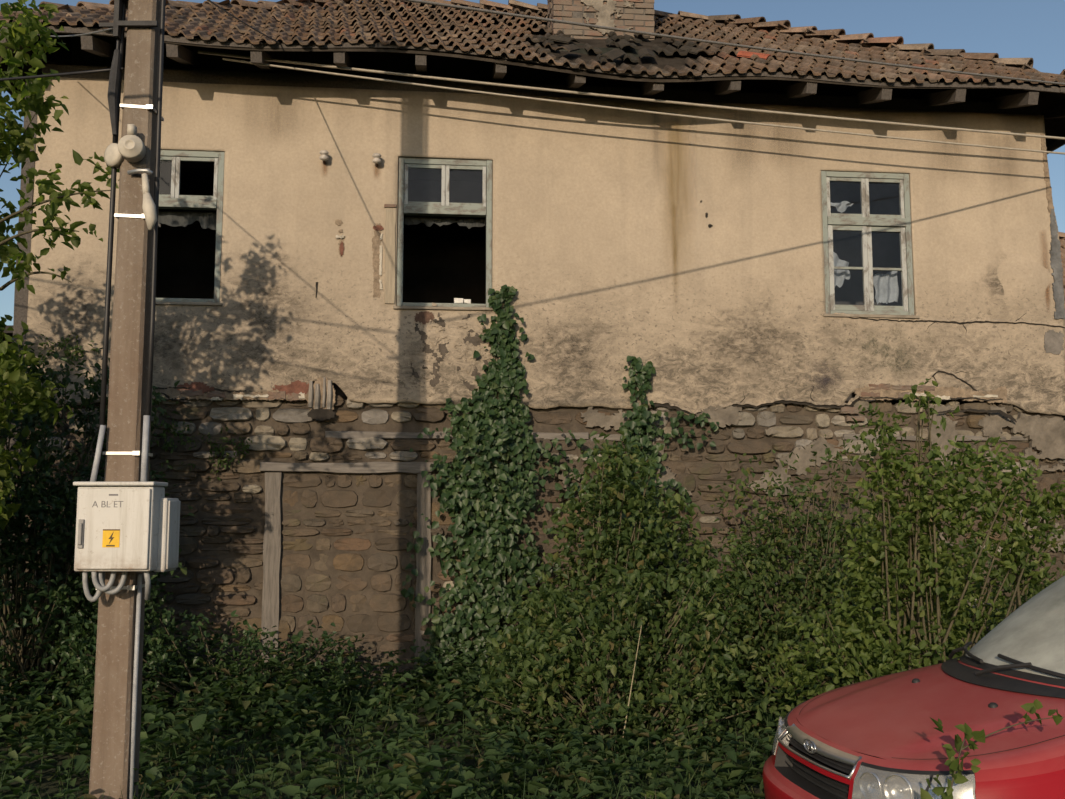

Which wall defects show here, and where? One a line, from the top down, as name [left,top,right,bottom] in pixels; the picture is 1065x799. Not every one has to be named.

peeling [372,223,384,298]
peeling [409,303,492,397]
crack [833,313,1065,332]
spalling [152,380,309,403]
flaking render [580,406,631,431]
flaking render [694,405,742,428]
flaking render [838,383,1065,471]
flaking render [650,440,692,496]
flaking render [747,437,846,496]
flaking render [1009,509,1065,552]